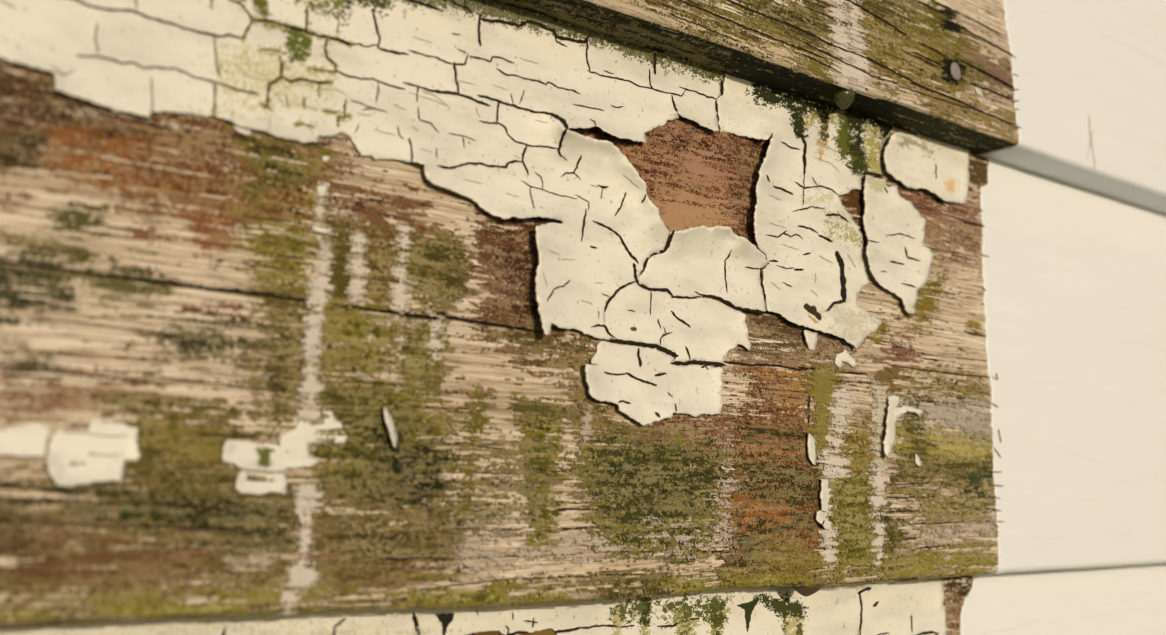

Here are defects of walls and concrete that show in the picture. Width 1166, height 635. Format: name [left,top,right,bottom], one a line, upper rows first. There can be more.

crack [670,0,1016,126]
leakage [0,59,374,421]
crack [0,260,543,333]
leakage [388,224,415,360]
peeling [0,0,970,426]
leakage [460,204,601,381]
peeling [0,419,141,487]
peeling [221,411,348,495]
leakage [0,296,999,615]
crack [724,361,868,427]
crack [895,364,990,378]
peeling [0,578,947,635]